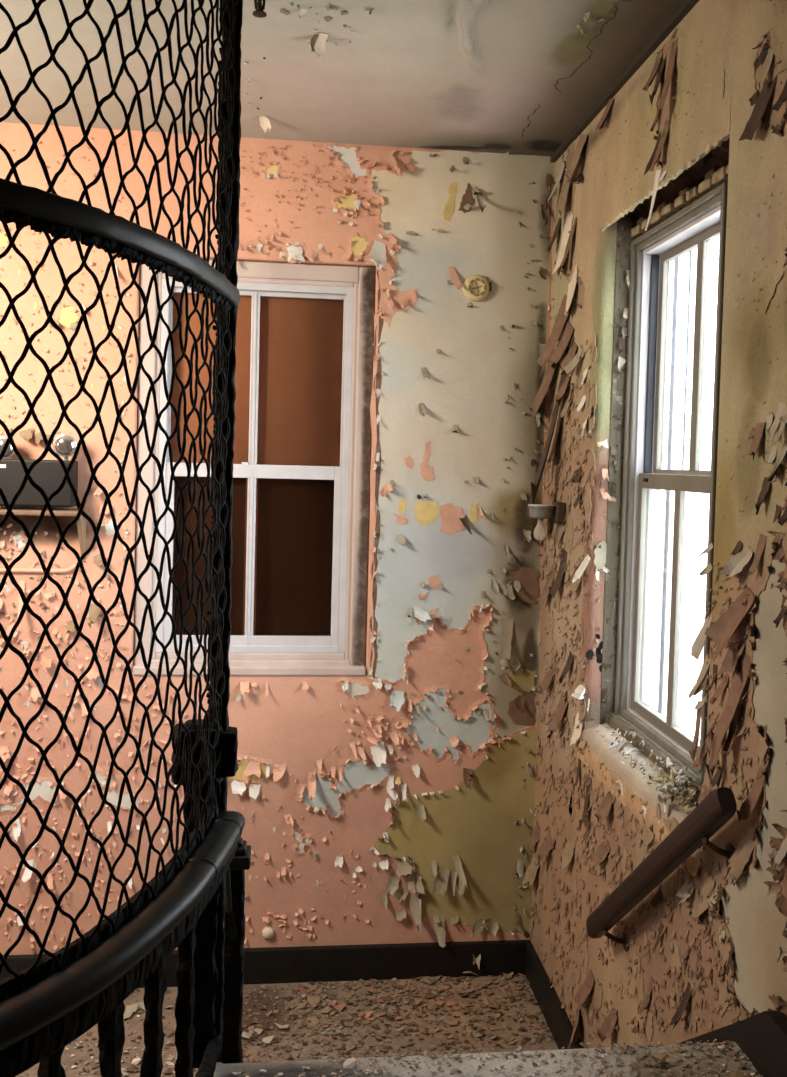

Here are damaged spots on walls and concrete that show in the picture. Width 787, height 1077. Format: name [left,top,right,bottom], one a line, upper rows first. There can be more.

peeling [280,2,354,59]
crack [522,0,632,137]
peeling [0,226,130,415]
crack [765,272,784,313]
peeling [0,394,93,445]
peeling [227,27,787,1046]
peeling [0,487,187,950]